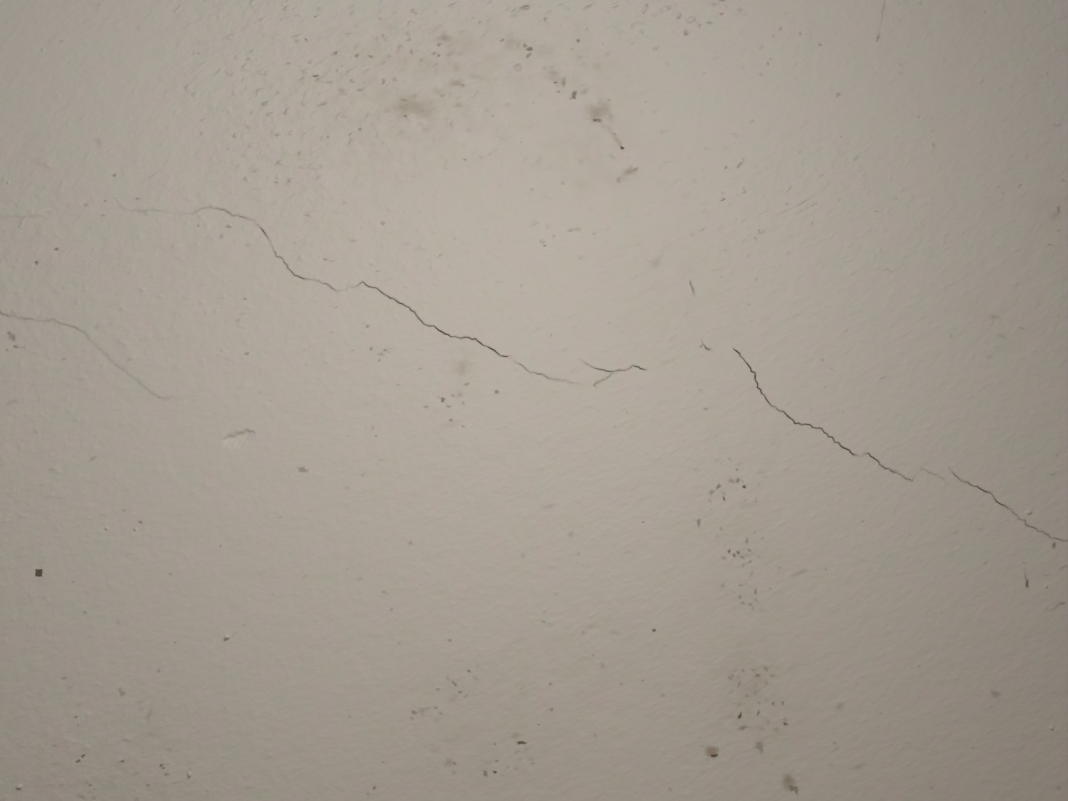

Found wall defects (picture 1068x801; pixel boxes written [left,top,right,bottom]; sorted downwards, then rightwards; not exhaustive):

crack [734,349,1060,540]